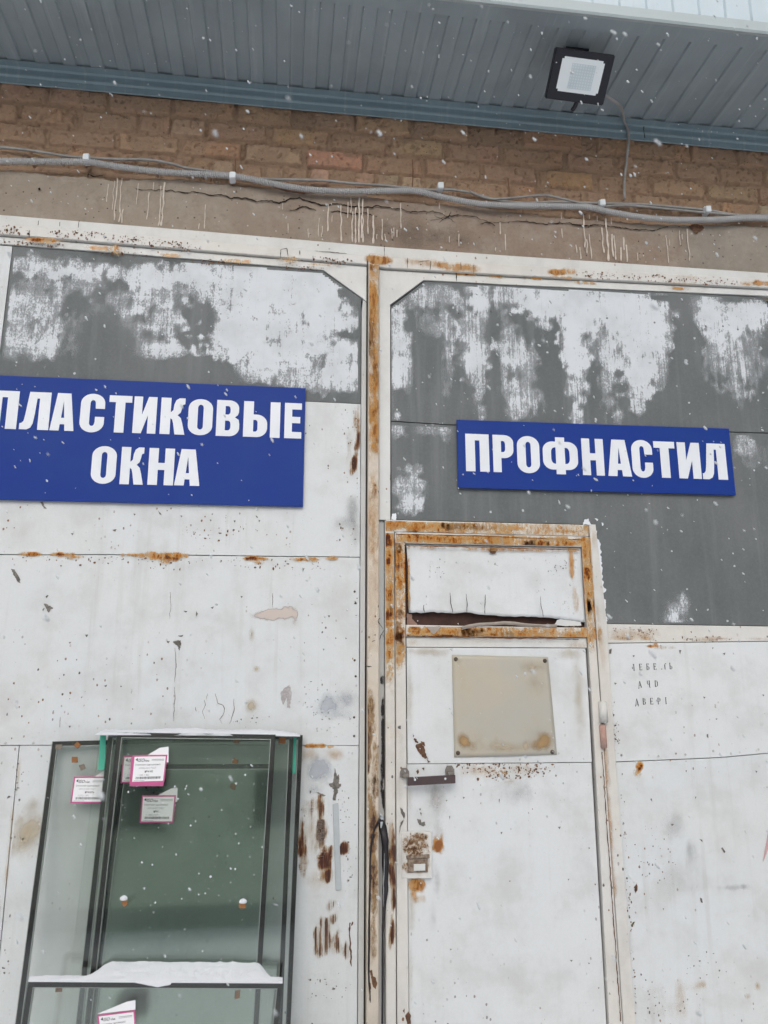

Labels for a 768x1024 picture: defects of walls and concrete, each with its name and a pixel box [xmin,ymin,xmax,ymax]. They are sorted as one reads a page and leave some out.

water stain [106,178,124,223]
water stain [136,182,166,226]
water stain [308,197,402,244]
water stain [576,214,638,262]
peeling [5,255,358,394]
corrosion [342,254,391,453]
peeling [391,285,679,424]
peeling [693,296,768,400]
peeling [391,465,426,521]
corrosion [12,552,203,570]
corrosion [386,521,601,680]
corrosion [368,690,426,957]